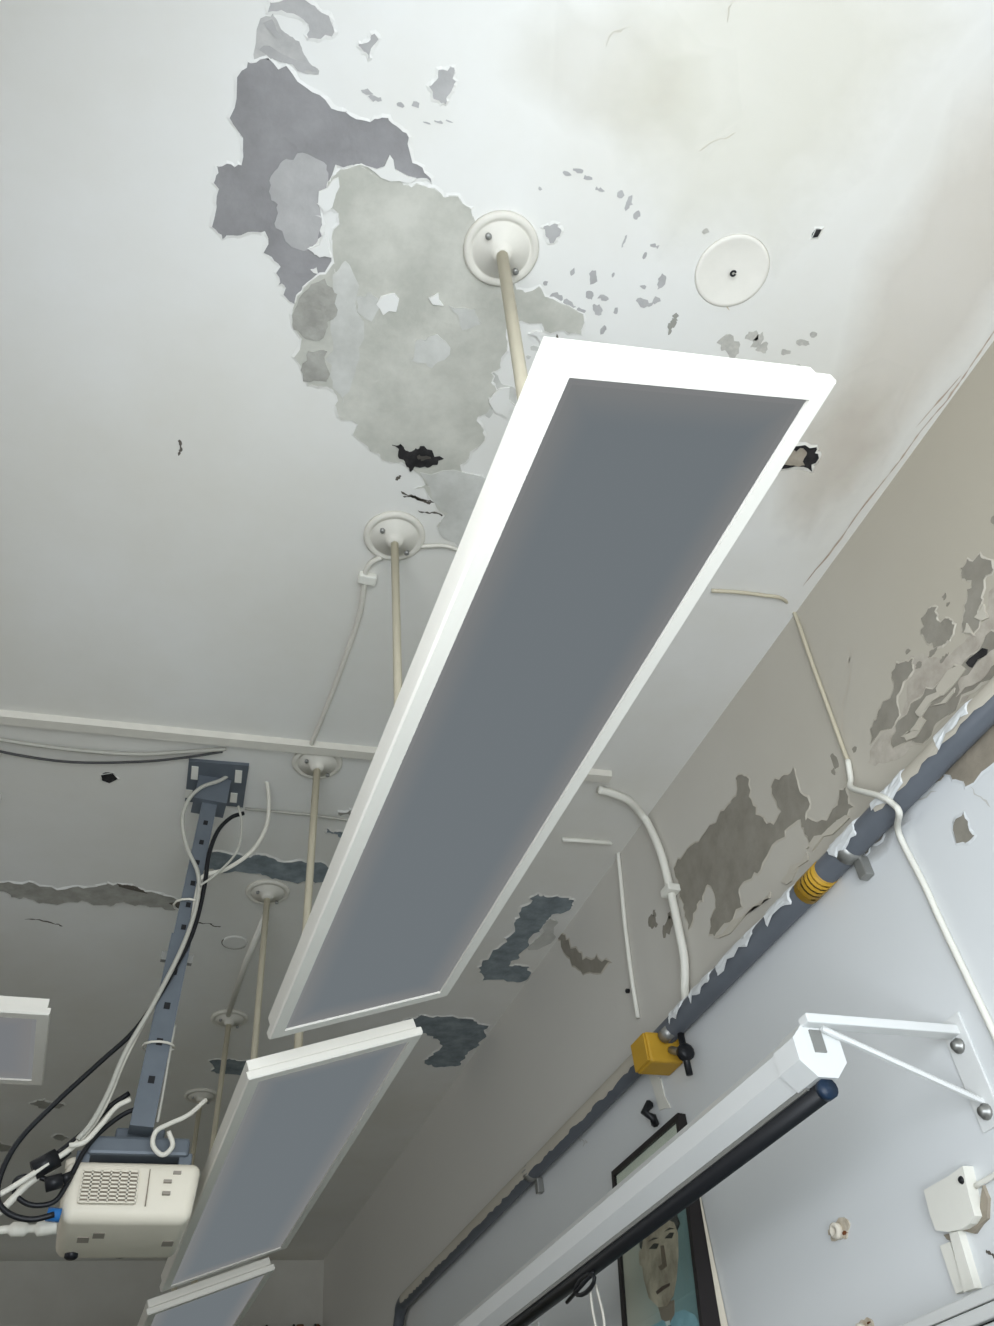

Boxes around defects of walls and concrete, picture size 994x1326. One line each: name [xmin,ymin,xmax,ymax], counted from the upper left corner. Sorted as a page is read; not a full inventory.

peeling [563,168,640,220]
peeling [209,0,618,547]
peeling [717,330,817,366]
spalling [780,442,822,473]
peeling [852,551,994,753]
peeling [938,725,994,790]
peeling [952,809,978,846]
spalling [0,880,180,911]
spalling [204,849,330,884]
peeling [648,753,904,1024]
spalling [477,892,612,983]
spalling [401,1013,491,1068]